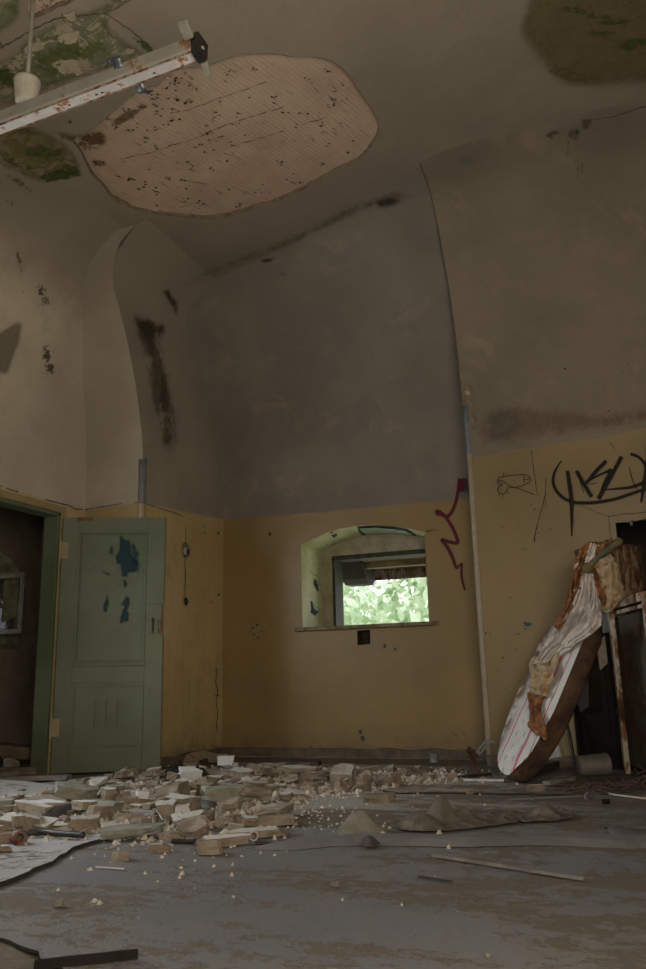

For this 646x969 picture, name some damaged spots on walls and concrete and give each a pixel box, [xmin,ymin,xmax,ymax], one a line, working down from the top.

flaking render [27,0,74,20]
leakage [0,128,81,185]
flaking render [73,53,378,220]
leakage [136,319,172,444]